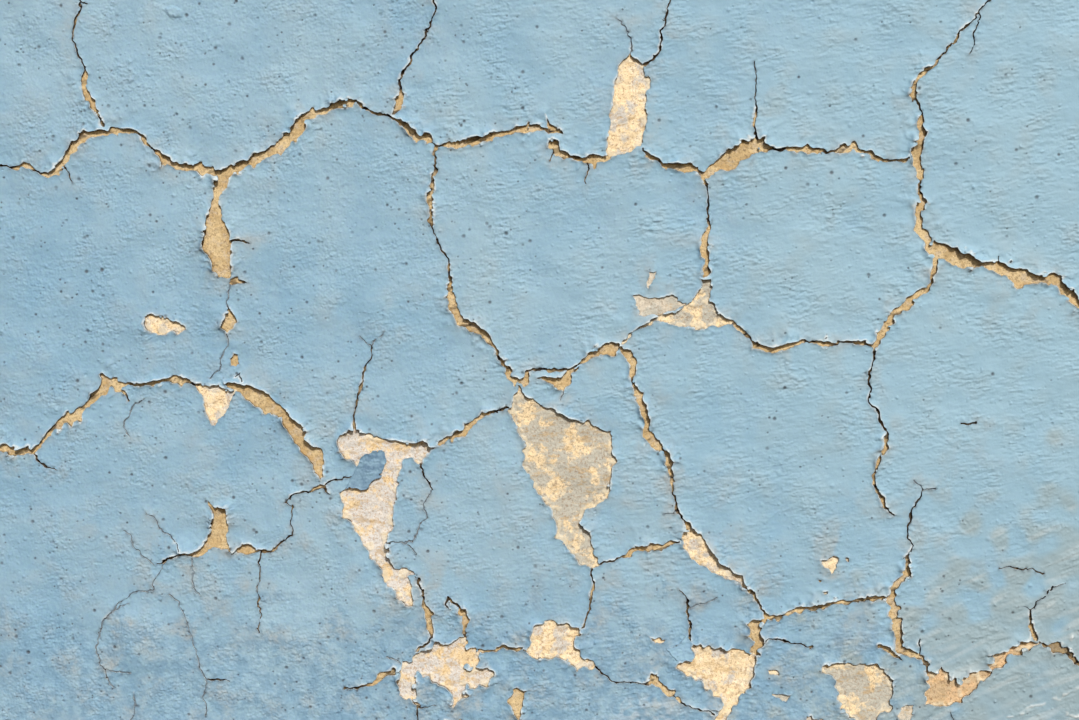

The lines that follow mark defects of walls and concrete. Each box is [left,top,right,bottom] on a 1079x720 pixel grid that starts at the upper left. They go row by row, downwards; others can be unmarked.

peeling [603,18,651,157]
peeling [196,170,438,610]
crack [0,0,695,628]
peeling [508,367,617,569]
peeling [622,176,736,344]
crack [642,0,1079,675]
crack [96,562,225,720]
crack [344,578,527,689]
peeling [394,637,499,720]
crack [595,666,718,717]
peeling [652,634,779,720]
peeling [819,660,913,720]